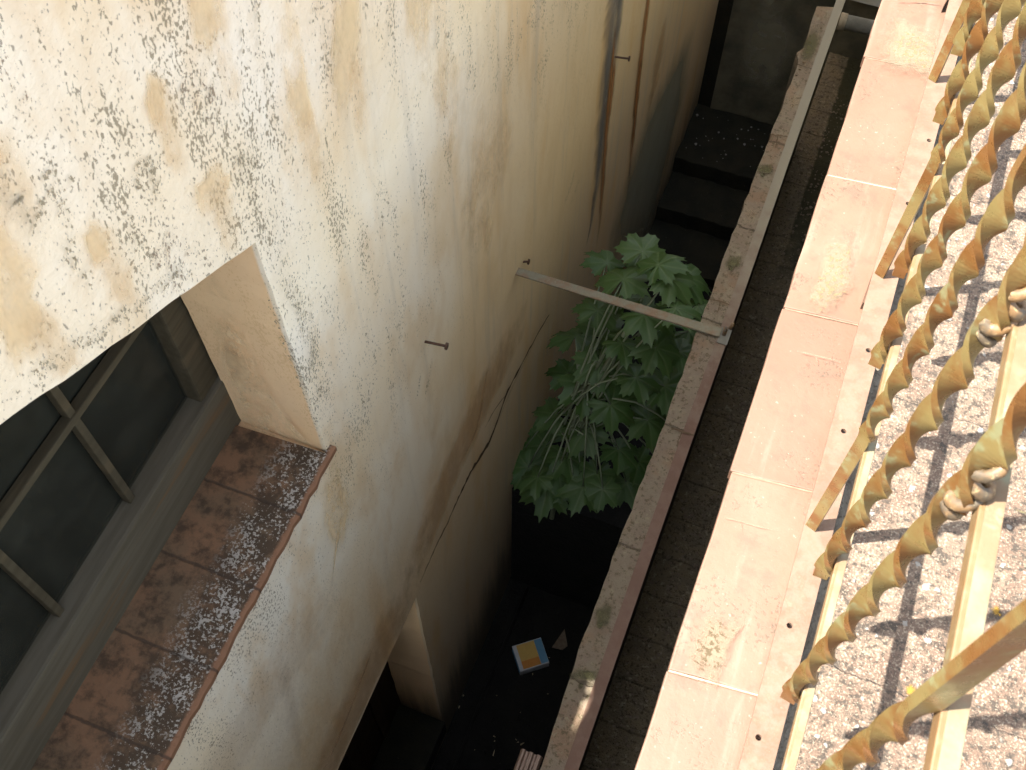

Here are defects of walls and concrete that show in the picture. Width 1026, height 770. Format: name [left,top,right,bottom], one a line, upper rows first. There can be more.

water stain [0,157,107,289]
water stain [19,203,220,386]
water stain [127,154,166,209]
water stain [180,69,221,130]
water stain [274,243,328,402]
water stain [290,75,313,124]
rust [600,37,615,219]
rust [629,0,650,174]
crack [420,315,549,582]